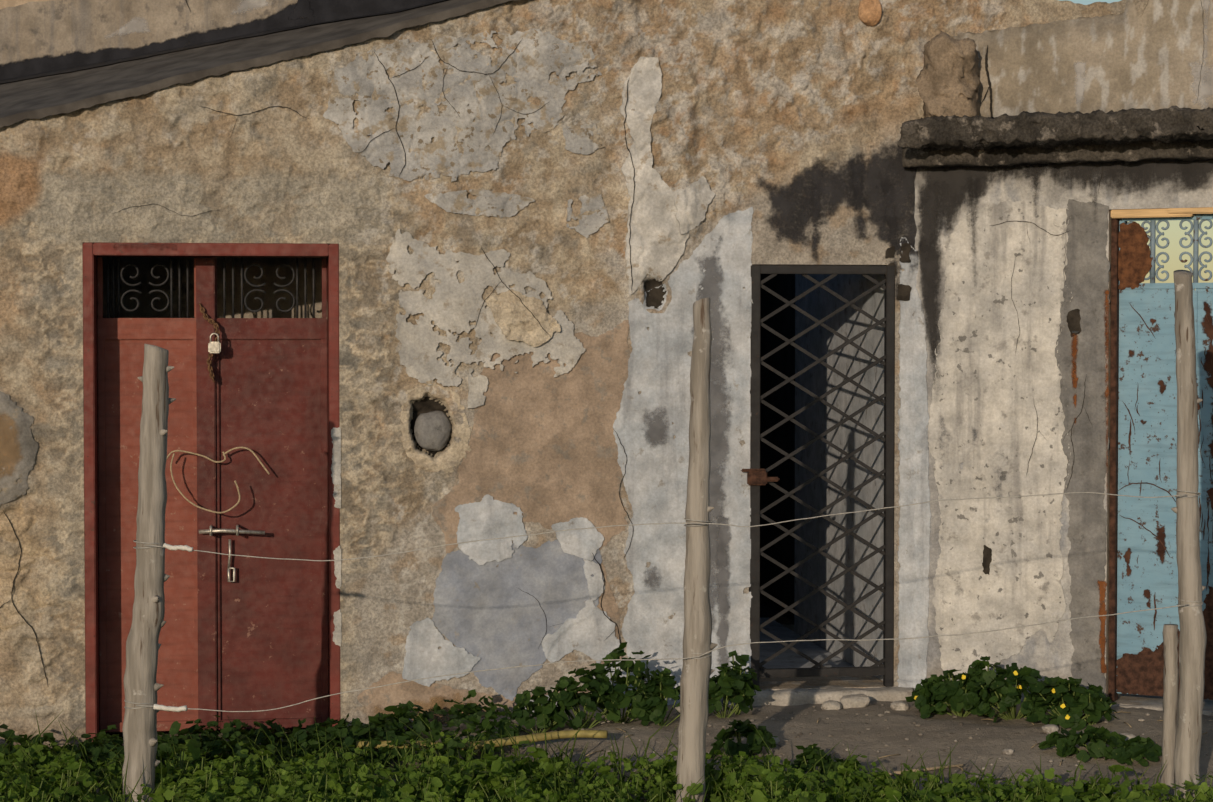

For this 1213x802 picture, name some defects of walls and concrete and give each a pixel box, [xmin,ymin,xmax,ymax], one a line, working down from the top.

flaking render [323,28,604,218]
crack [981,45,993,117]
flaking render [357,57,753,724]
leakage [760,141,1213,363]
corrosion [1104,222,1152,466]
corrosion [1123,548,1139,576]
corrosion [1127,382,1147,493]
corrosion [1098,580,1180,697]
corrosion [1157,526,1166,564]
corrosion [1196,302,1213,700]